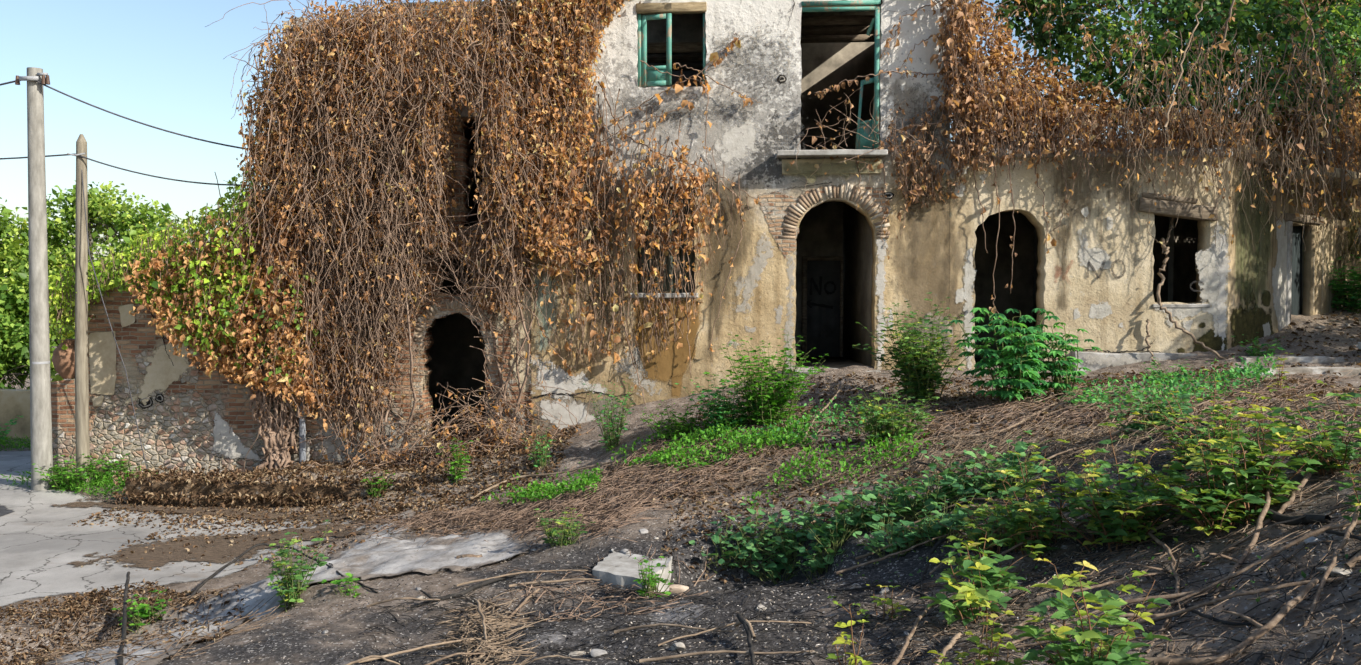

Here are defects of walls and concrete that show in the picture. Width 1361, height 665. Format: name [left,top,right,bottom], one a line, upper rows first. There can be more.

damp [702,110,881,349]
damp [1234,167,1273,307]
peeling [118,304,135,327]
peeling [125,316,200,405]
peeling [306,288,623,462]
peeling [612,347,662,396]